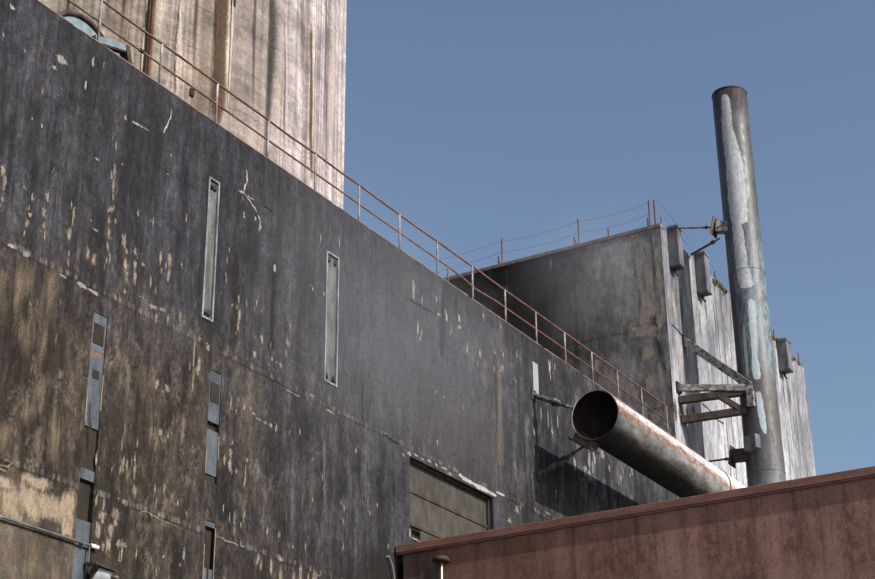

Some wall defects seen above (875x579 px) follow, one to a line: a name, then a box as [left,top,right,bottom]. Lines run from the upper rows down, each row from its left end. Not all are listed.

peeling [23,185,49,239]
crack [239,170,273,229]
peeling [721,94,754,289]
peeling [42,201,75,311]
peeling [189,336,210,390]
peeling [743,299,761,380]
peeling [35,408,60,458]
peeling [755,392,767,434]
peeling [95,437,138,562]
peeling [223,441,248,486]
spalling [402,451,504,497]
spalling [256,553,320,579]